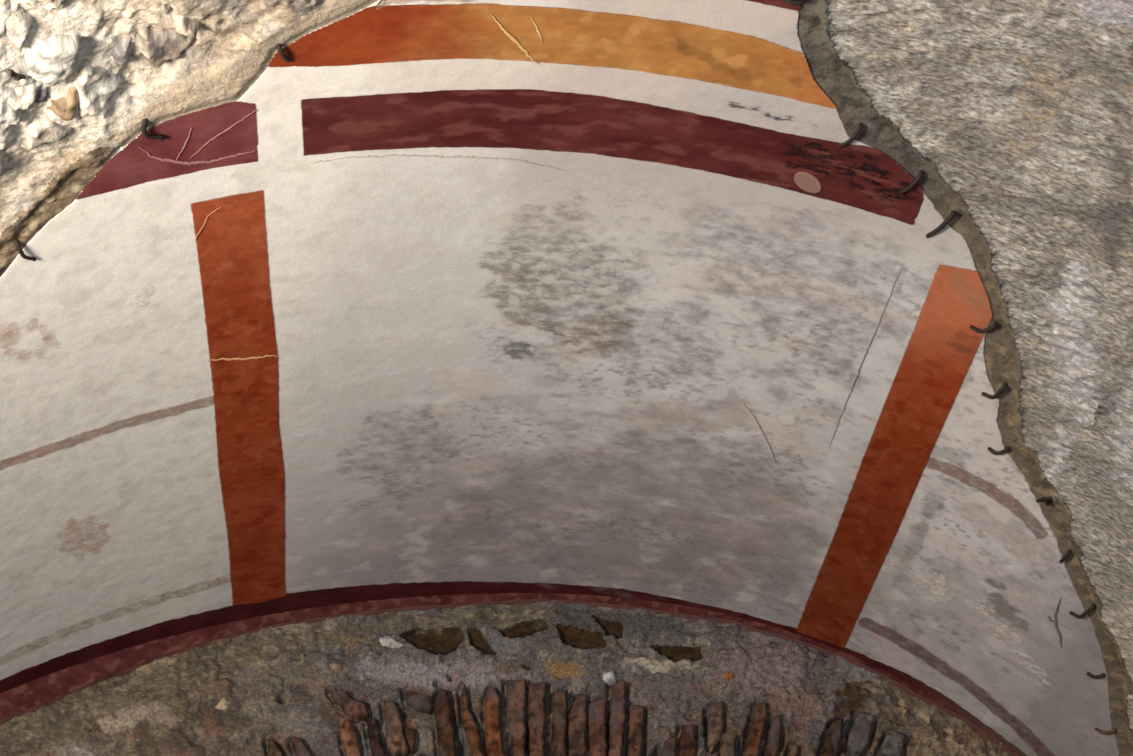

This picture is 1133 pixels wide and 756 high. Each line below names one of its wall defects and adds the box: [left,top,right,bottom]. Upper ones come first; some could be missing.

crack [491,14,543,64]
crack [139,110,256,166]
peeling [786,143,916,202]
crack [208,354,278,362]
spalling [399,626,497,656]
spalling [498,614,623,649]
spalling [650,644,702,661]